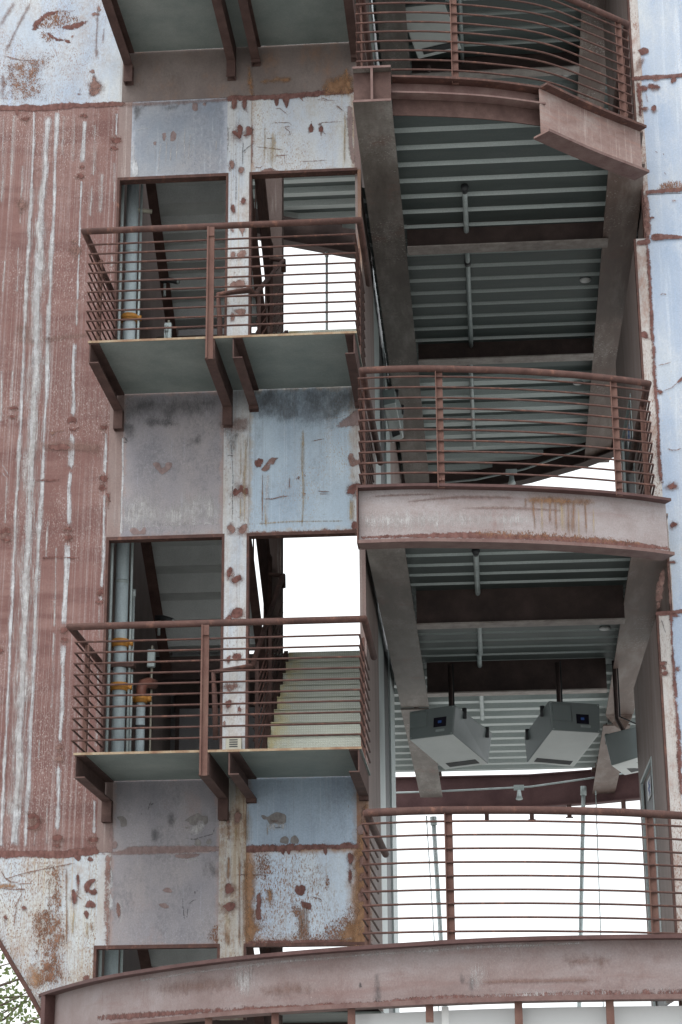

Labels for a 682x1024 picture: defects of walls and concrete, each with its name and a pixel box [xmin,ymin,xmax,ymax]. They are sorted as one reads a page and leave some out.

rust [0,7,354,124]
rust [632,47,682,116]
leakage [0,112,115,846]
rust [226,419,682,794]
rust [637,180,682,489]
rust [0,805,372,993]